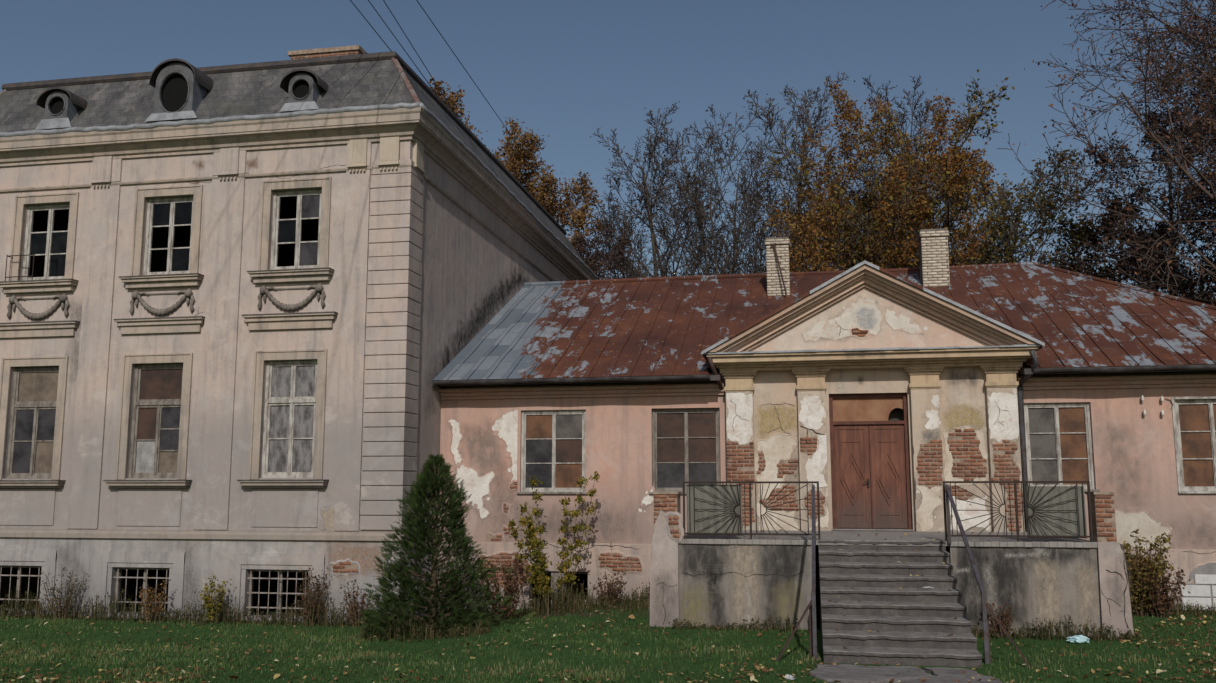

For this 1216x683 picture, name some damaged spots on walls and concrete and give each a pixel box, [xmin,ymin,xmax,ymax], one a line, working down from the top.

flaking render [802,296,928,342]
flaking render [726,391,829,531]
flaking render [916,388,1024,532]
flaking render [447,408,533,588]
flaking render [595,550,644,576]
flaking render [639,486,655,512]
flaking render [664,511,684,543]
flaking render [1115,509,1172,578]